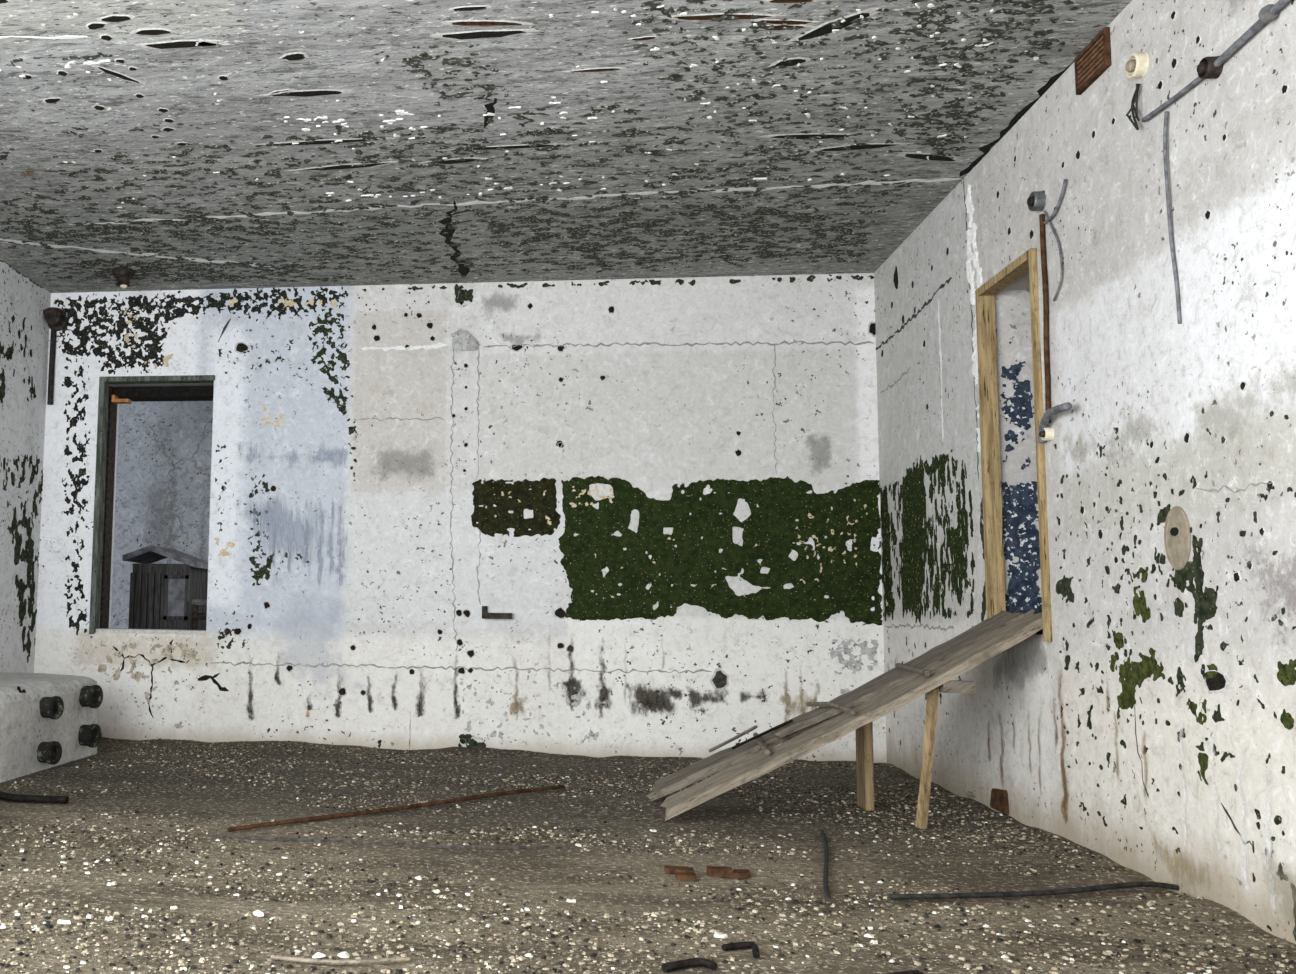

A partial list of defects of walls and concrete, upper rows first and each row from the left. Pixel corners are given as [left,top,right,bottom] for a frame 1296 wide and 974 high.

crack [0,61,1074,288]
peeling [0,0,1078,707]
damp [562,648,576,710]
peeling [1000,361,1235,787]
peeling [1239,485,1296,537]